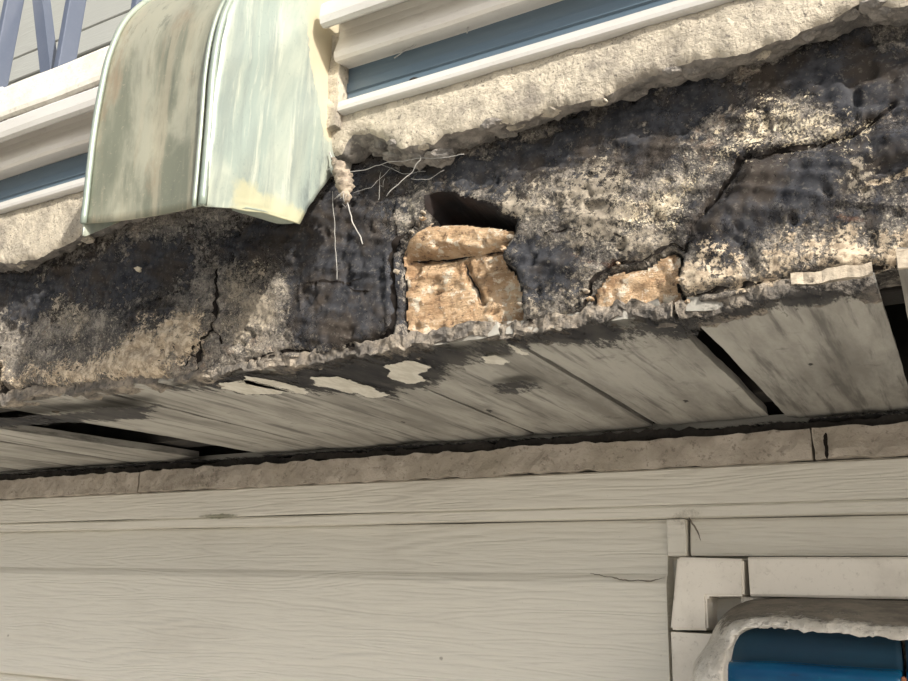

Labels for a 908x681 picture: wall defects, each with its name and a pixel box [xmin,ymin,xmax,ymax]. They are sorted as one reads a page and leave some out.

spalling [335,0,908,171]
crack [125,268,222,370]
spalling [0,191,883,408]
leakage [0,24,908,391]
crack [545,109,890,308]
crack [872,263,897,271]